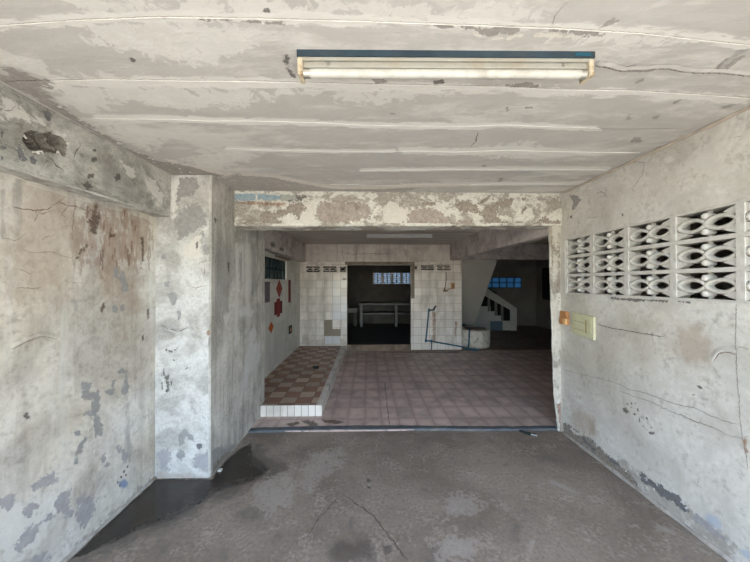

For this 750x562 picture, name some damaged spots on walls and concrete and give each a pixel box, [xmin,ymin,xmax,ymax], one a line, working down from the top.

crack [594,61,750,77]
peeling [0,55,583,264]
crack [5,200,96,283]
peeling [163,280,183,321]
peeling [0,465,100,562]
peeling [72,367,136,473]
water stain [68,440,295,562]
peeling [156,426,239,476]
crack [307,493,408,560]
spalling [556,398,733,549]
crack [562,306,748,468]